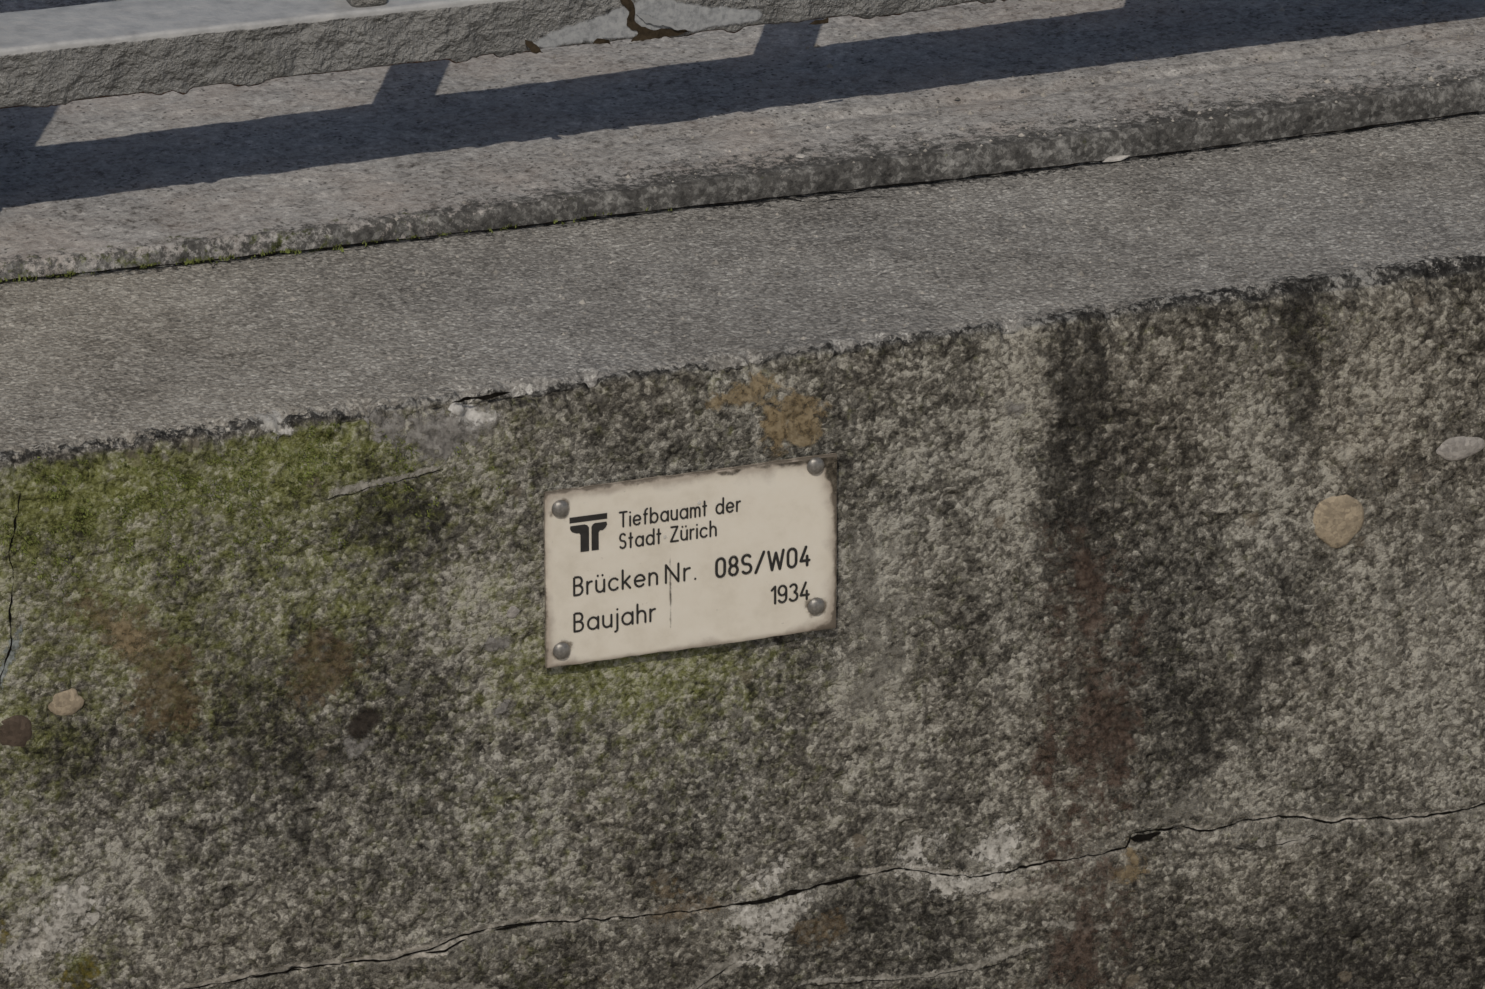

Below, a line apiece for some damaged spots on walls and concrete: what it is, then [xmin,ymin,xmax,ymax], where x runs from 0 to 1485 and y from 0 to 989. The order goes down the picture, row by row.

peeling [524,0,762,54]
crack [0,492,22,688]
crack [162,803,1485,989]